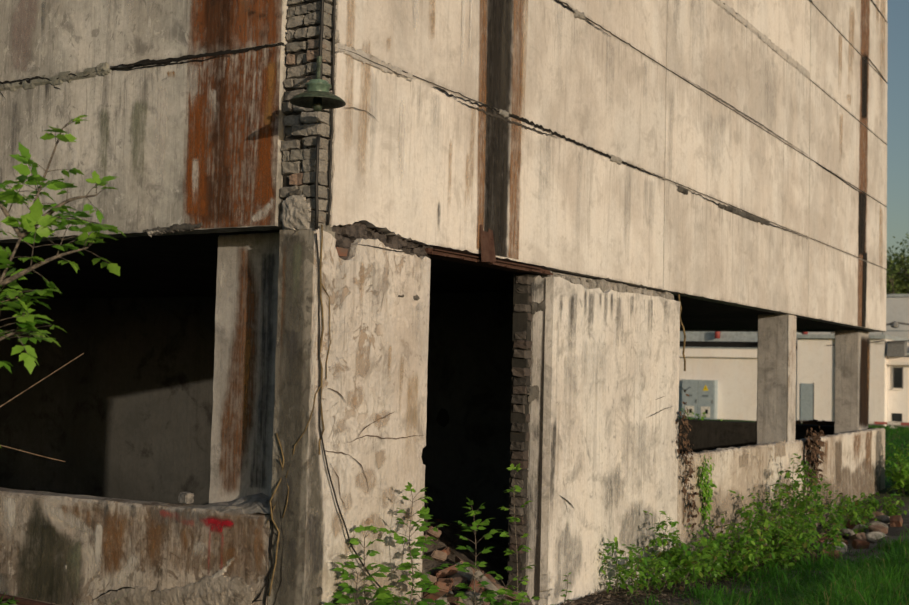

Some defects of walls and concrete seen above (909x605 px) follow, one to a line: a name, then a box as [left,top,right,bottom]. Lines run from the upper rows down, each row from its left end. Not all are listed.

corrosion [186,0,282,229]
corrosion [839,0,886,327]
spalling [332,221,433,260]
corrosion [220,249,286,491]
corrosion [859,338,870,426]
crack [325,412,422,510]
leakage [19,502,109,605]